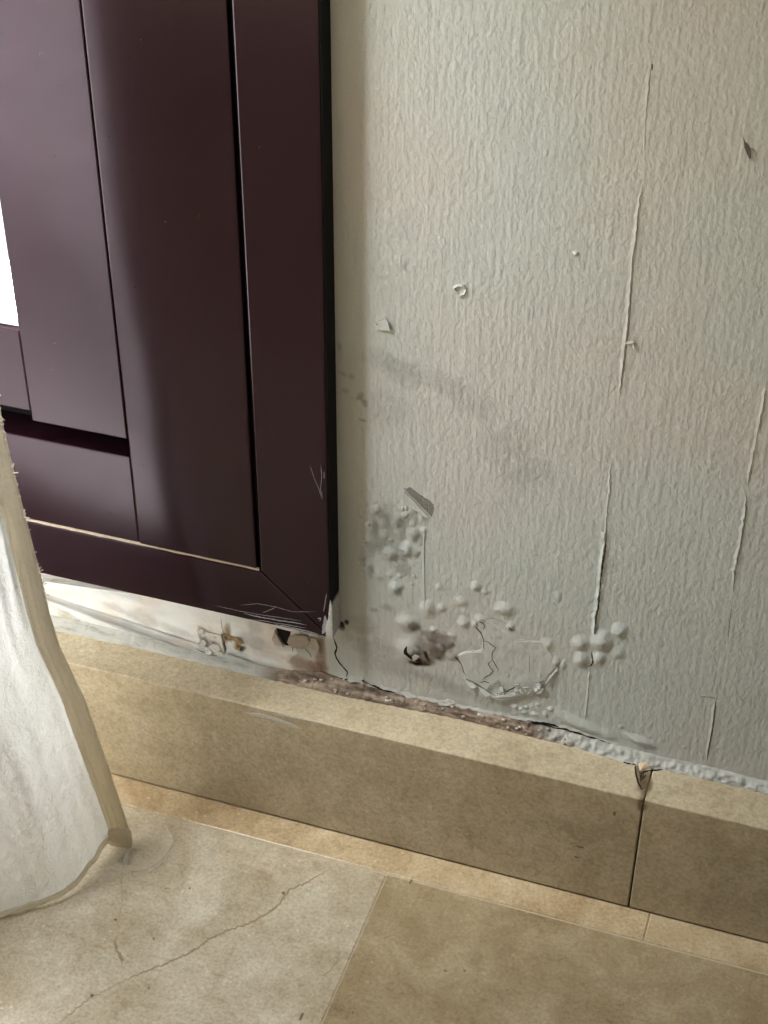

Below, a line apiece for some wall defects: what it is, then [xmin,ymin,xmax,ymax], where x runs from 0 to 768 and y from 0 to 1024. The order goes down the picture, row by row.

crack [618,59,653,397]
peeling [197,623,226,657]
spalling [272,628,320,656]
peeling [402,487,434,608]
crack [320,460,637,750]
crack [728,377,767,633]